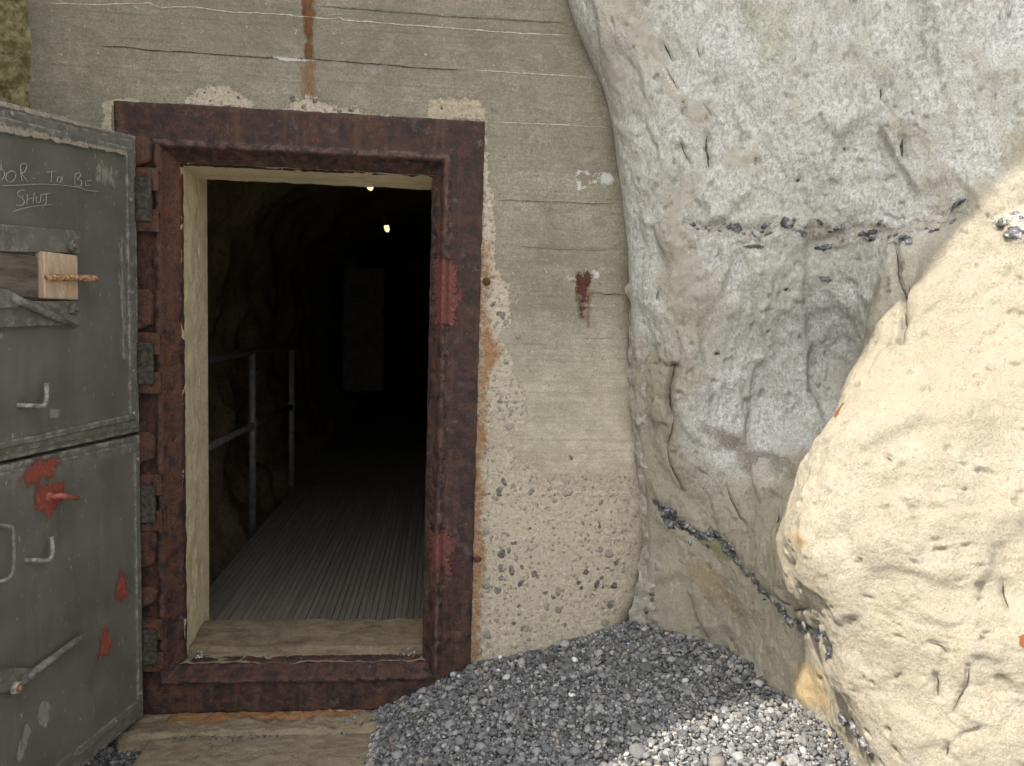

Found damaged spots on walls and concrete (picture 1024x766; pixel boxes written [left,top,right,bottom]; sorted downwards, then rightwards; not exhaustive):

spalling [184,83,254,108]
rust [301,0,315,95]
crack [104,46,588,78]
rust [573,268,593,324]
spalling [423,96,643,665]
rust [470,254,500,660]